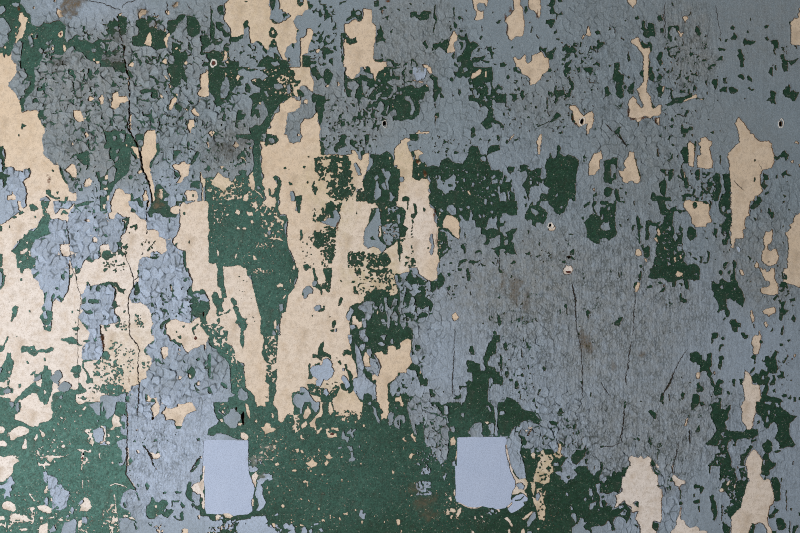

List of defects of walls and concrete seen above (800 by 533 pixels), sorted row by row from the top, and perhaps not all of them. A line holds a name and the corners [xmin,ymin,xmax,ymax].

peeling [398,3,437,33]
spalling [423,0,800,293]
spalling [58,241,76,257]
crack [66,228,82,390]
peeling [185,367,200,393]
crack [572,284,625,447]
spalling [679,195,800,533]
spalling [145,394,196,435]
peeling [146,492,188,533]